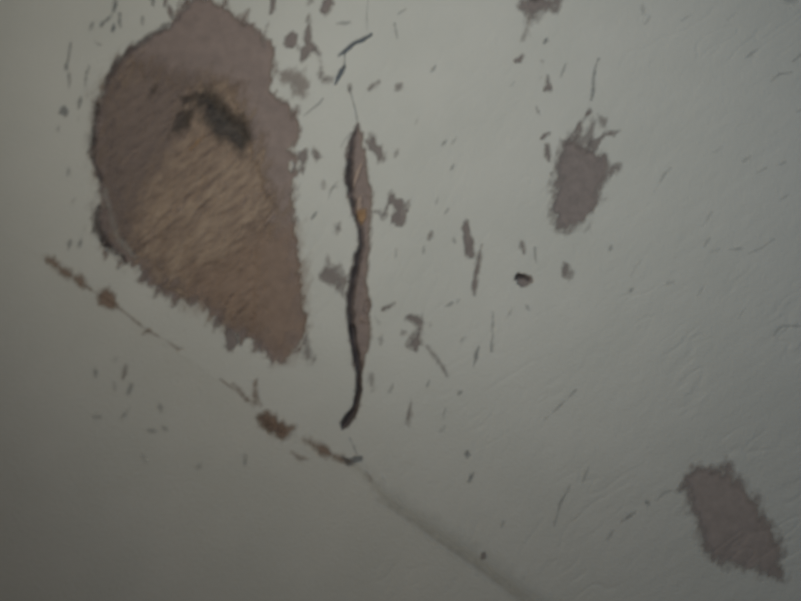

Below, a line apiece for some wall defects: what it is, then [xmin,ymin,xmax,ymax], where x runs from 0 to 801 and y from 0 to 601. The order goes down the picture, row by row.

spalling [92,0,320,363]
peeling [383,195,408,226]
peeling [541,111,619,231]
crack [342,124,372,428]
peeling [515,274,533,287]
peeling [684,464,782,578]